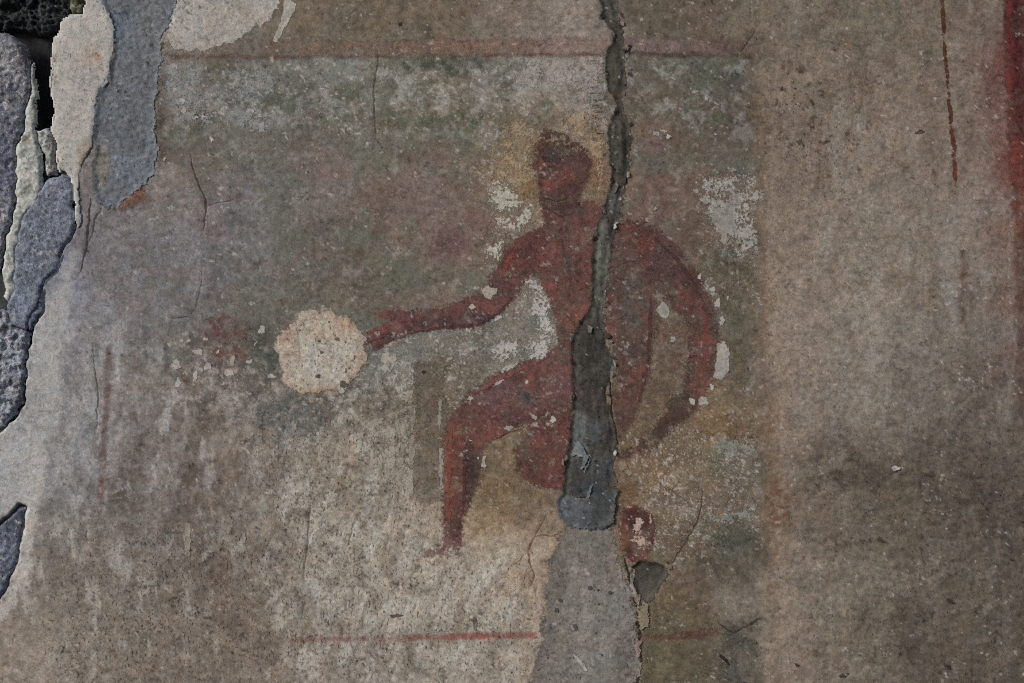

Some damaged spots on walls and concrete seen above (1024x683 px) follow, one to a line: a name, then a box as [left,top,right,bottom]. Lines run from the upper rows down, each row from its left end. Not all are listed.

peeling [480,119,533,269]
crack [515,0,633,584]
peeling [693,174,760,266]
spalling [614,461,672,659]